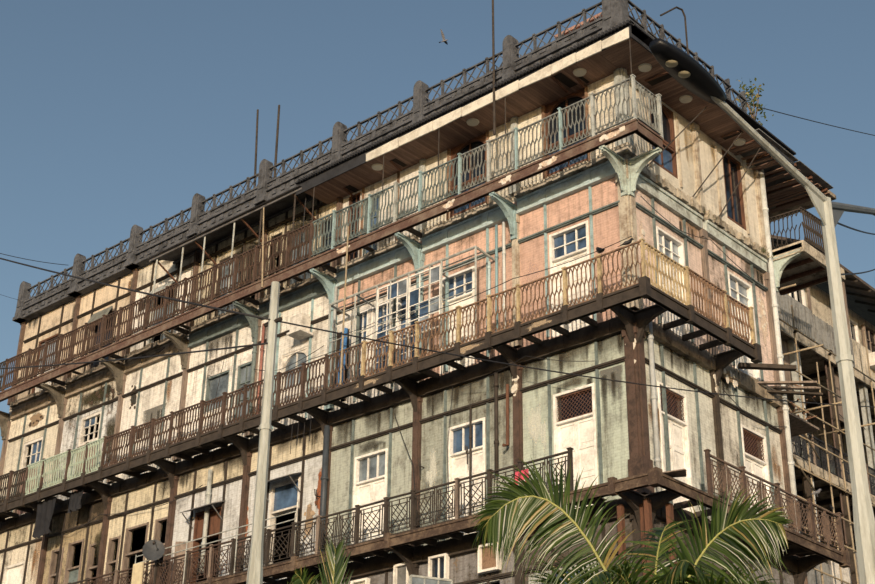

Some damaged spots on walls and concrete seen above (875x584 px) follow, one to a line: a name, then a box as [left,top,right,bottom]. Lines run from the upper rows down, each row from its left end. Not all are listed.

peeling [599,126,625,142]
water stain [81,388,114,411]
spalling [303,469,322,539]